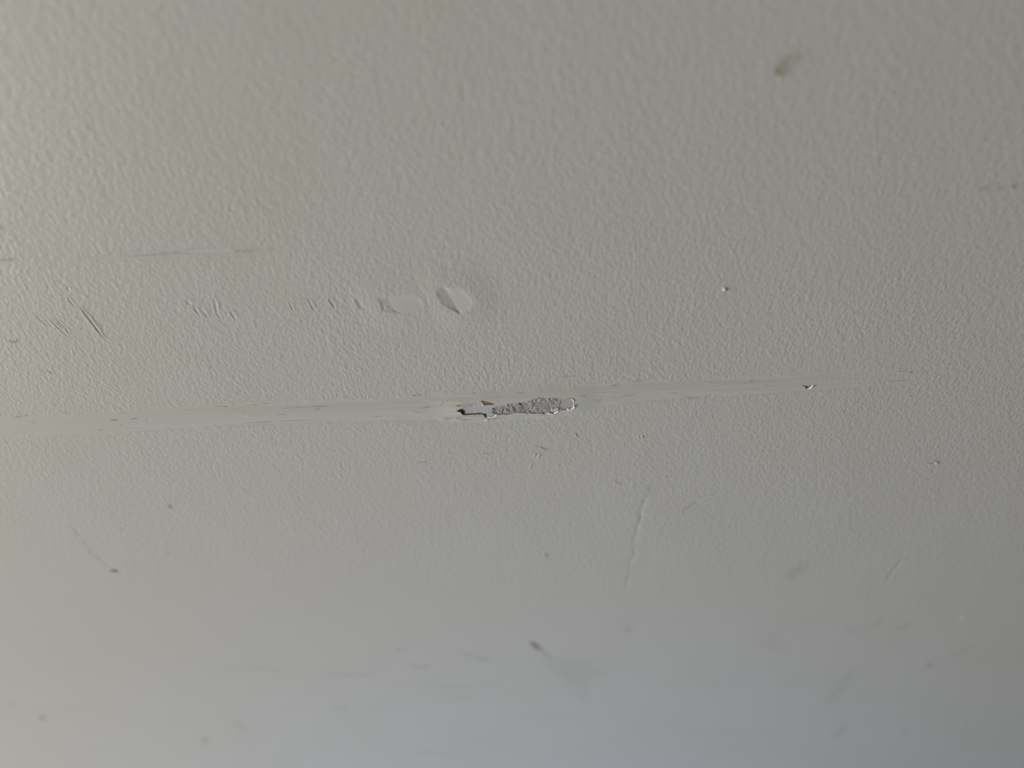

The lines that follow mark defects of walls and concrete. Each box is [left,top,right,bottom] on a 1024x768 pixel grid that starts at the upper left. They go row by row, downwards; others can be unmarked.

peeling [456,397,579,421]